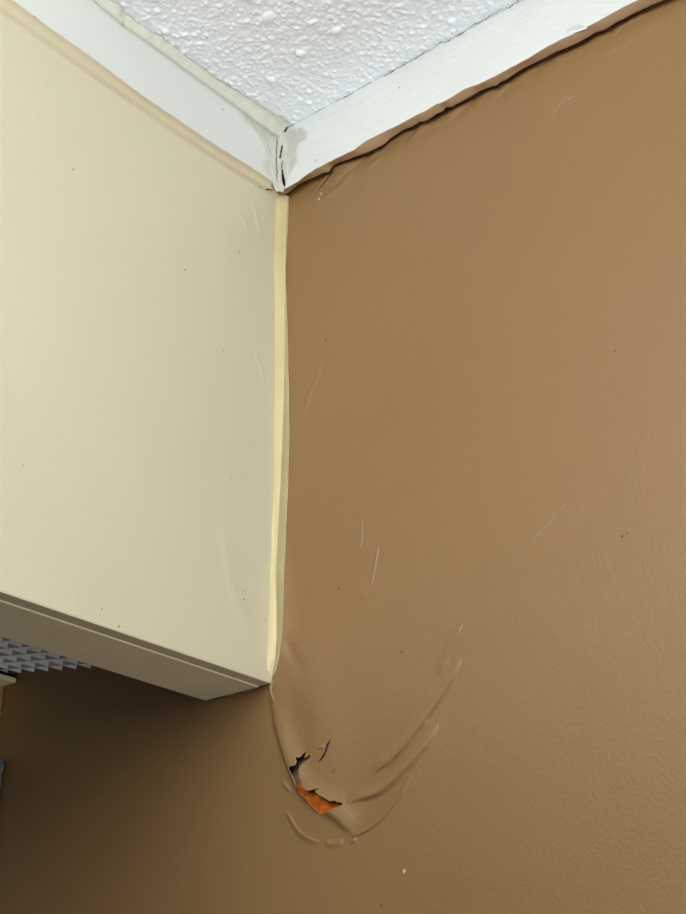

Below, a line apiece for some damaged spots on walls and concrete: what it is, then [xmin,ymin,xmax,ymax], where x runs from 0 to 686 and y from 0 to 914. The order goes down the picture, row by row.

peeling [567,24,587,33]
peeling [288,752,342,814]